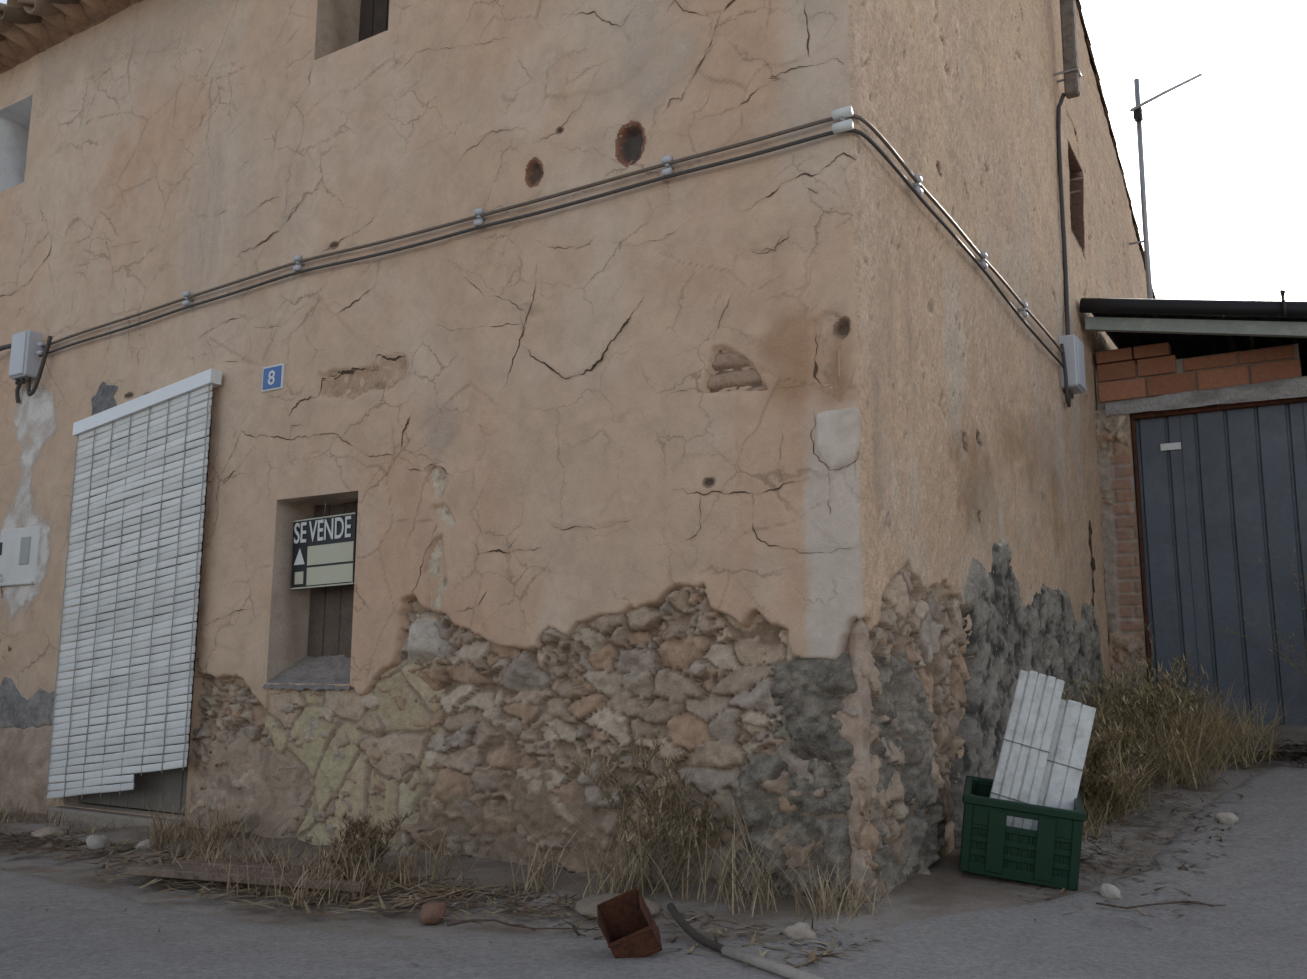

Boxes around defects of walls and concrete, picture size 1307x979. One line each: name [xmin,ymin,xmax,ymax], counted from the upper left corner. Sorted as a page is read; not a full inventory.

crack [564,11,631,31]
crack [664,0,735,112]
crack [712,7,844,116]
crack [238,197,304,255]
crack [746,152,854,211]
crack [438,226,681,400]
crack [208,354,447,483]
spalling [320,356,409,400]
spalling [707,350,768,393]
crack [675,334,861,554]
spalling [188,469,880,888]